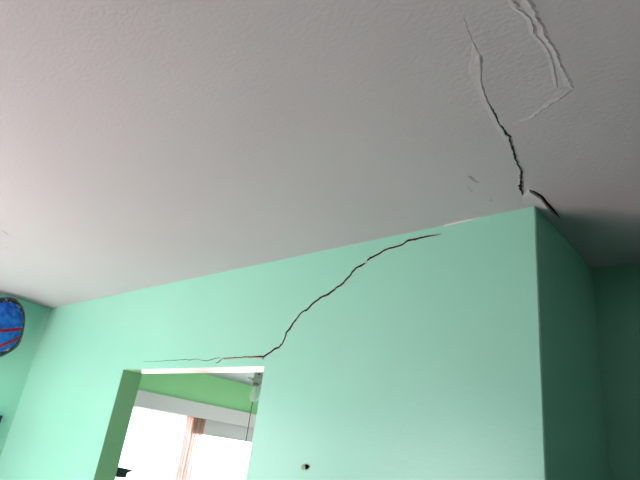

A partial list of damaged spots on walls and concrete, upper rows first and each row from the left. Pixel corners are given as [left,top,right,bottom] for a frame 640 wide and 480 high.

crack [463,18,560,223]
peeling [508,0,574,124]
crack [143,233,442,363]